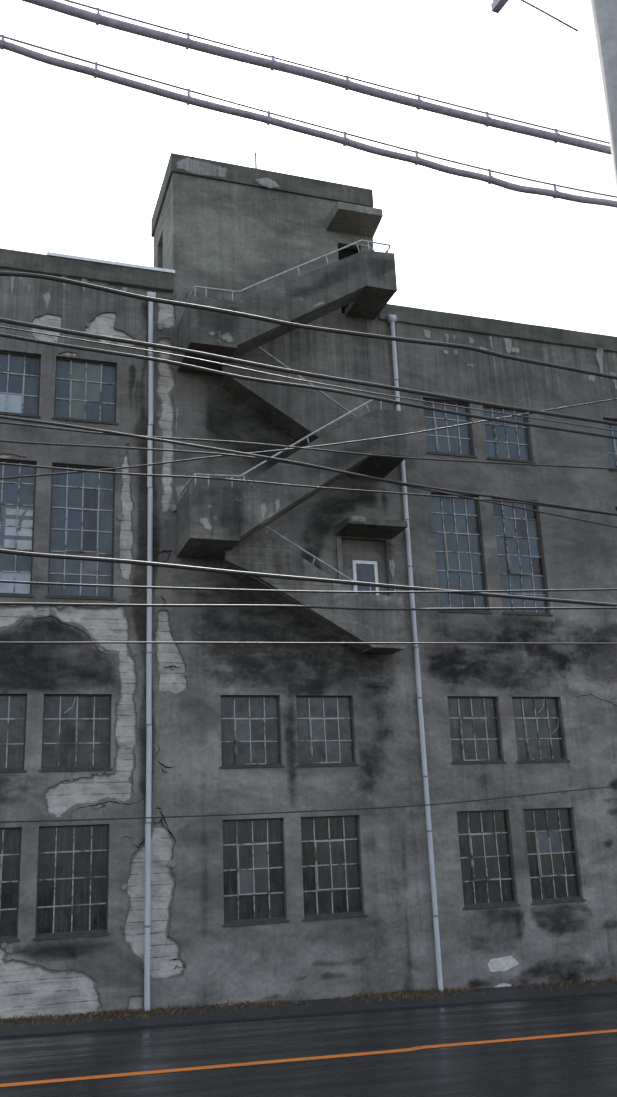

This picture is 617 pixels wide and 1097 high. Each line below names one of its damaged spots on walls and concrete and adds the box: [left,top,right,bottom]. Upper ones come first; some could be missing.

spalling [30,314,78,357]
spalling [83,310,137,348]
spalling [155,296,177,513]
damp [0,621,111,690]
spalling [154,610,188,694]
damp [431,618,593,688]
spalling [0,601,140,820]
crack [70,800,177,848]
spalling [119,818,186,981]
spalling [0,942,103,1020]
spalling [127,995,144,1012]